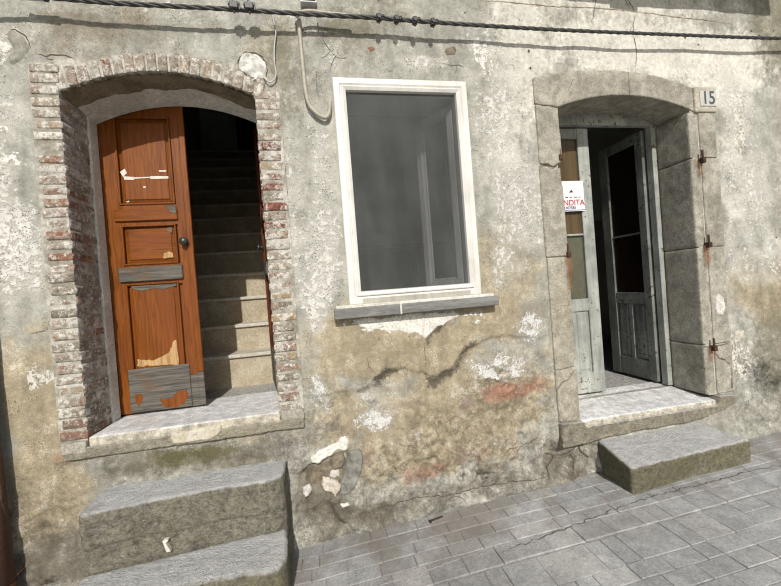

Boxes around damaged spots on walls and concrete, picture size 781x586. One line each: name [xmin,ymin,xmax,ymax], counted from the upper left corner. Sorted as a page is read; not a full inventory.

crack [504,0,723,61]
peeling [0,41,12,66]
peeling [0,151,22,181]
peeling [342,311,482,339]
peeling [27,366,54,391]
flaking render [302,436,363,508]
crack [375,438,590,511]